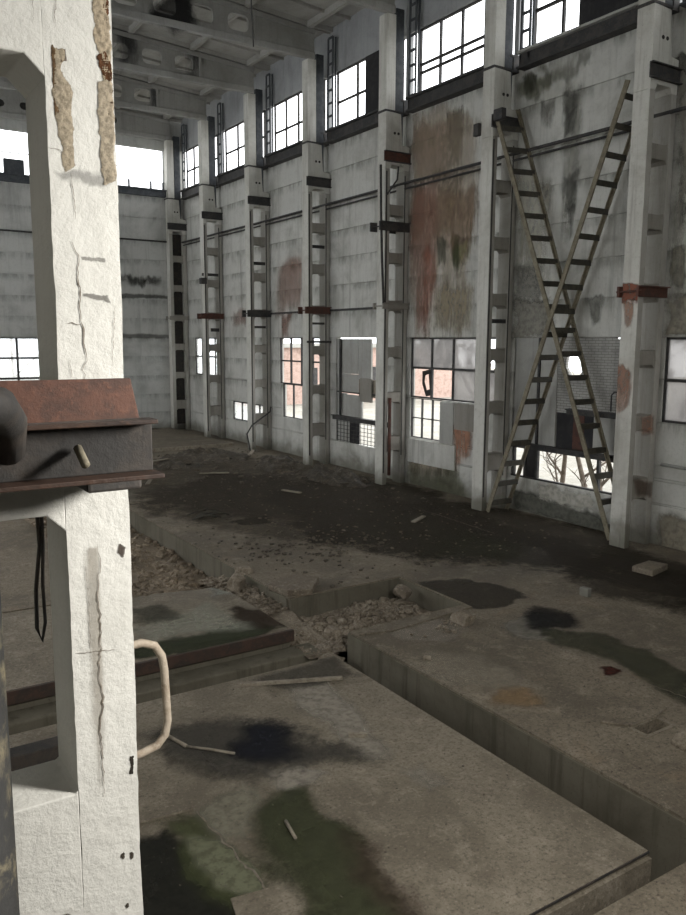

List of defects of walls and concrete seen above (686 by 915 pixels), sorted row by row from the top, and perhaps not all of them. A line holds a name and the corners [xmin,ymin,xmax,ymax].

spalling [51,45,75,172]
spalling [92,0,117,185]
leakage [517,73,553,124]
leakage [565,89,581,208]
leakage [122,274,168,299]
corrosion [436,284,471,331]
leakage [589,295,603,323]
corrosion [622,283,638,326]
corrosion [617,365,630,409]
corrosion [453,428,470,460]
crack [85,546,116,797]